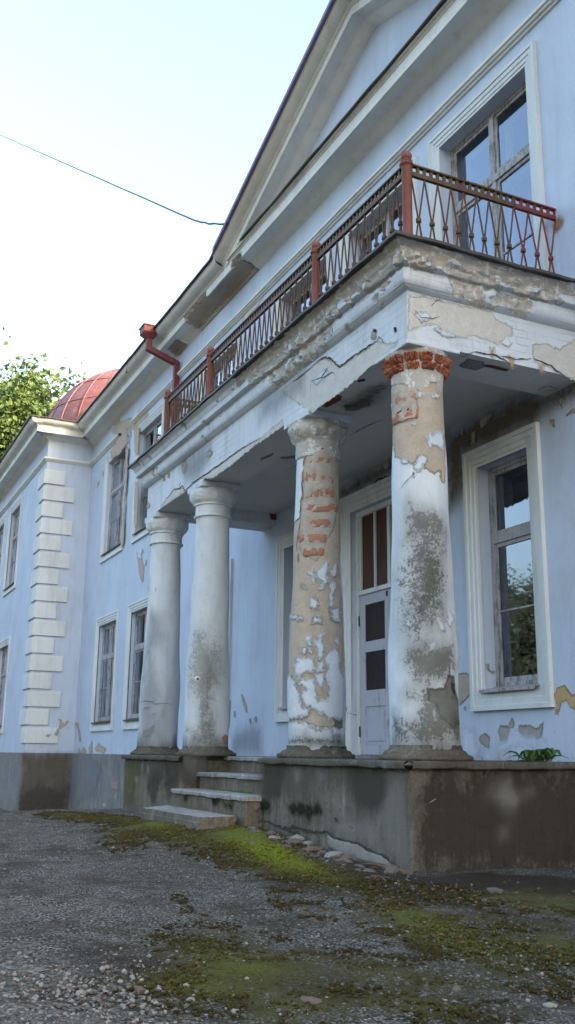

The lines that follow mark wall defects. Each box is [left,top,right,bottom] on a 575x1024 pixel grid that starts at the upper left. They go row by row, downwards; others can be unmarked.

peeling [407,294,513,347]
crack [294,336,383,388]
peeling [532,339,575,381]
peeling [282,339,509,483]
peeling [136,549,147,581]
peeling [260,449,345,729]
leakage [410,550,440,625]
spalling [426,672,470,729]
peeling [554,684,575,715]
peeling [45,719,106,754]
peeling [479,718,544,749]
crack [255,806,400,868]